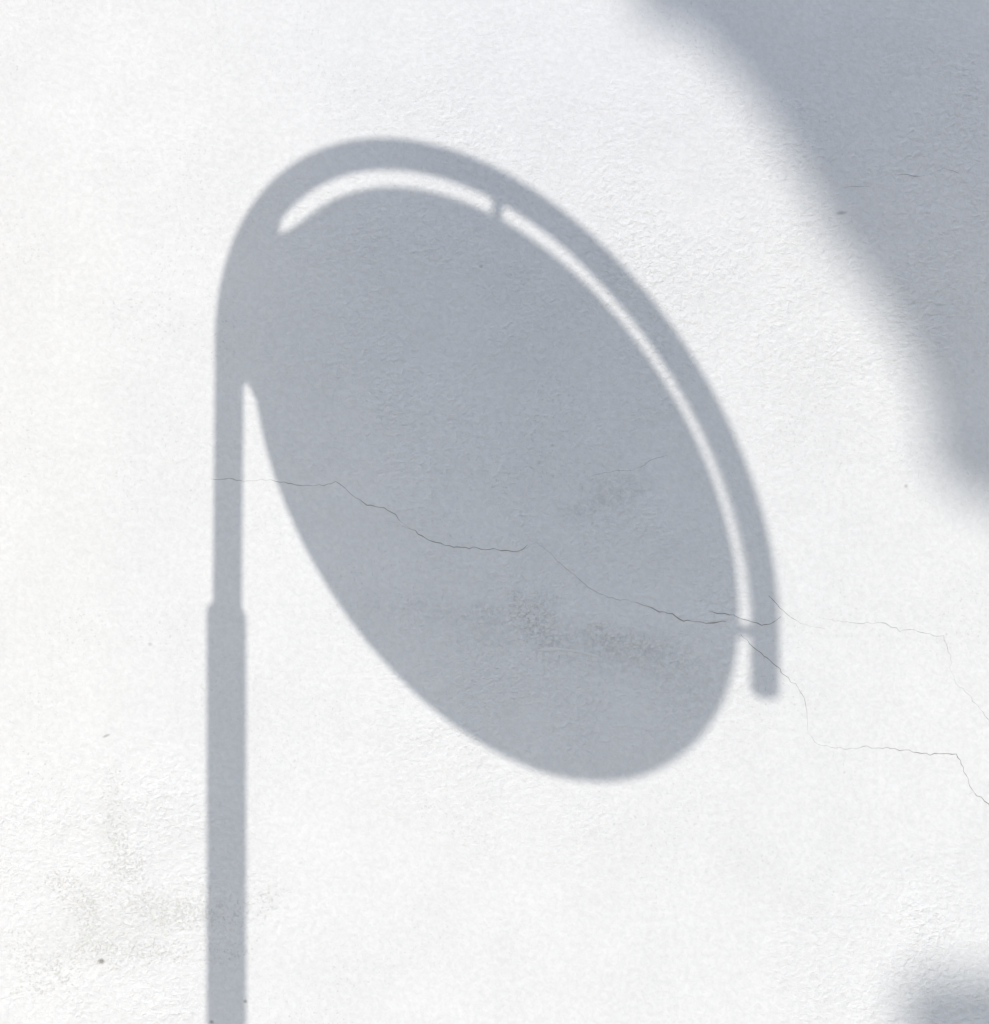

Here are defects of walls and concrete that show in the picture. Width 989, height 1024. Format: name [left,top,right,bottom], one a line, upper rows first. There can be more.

crack [214,478,989,804]